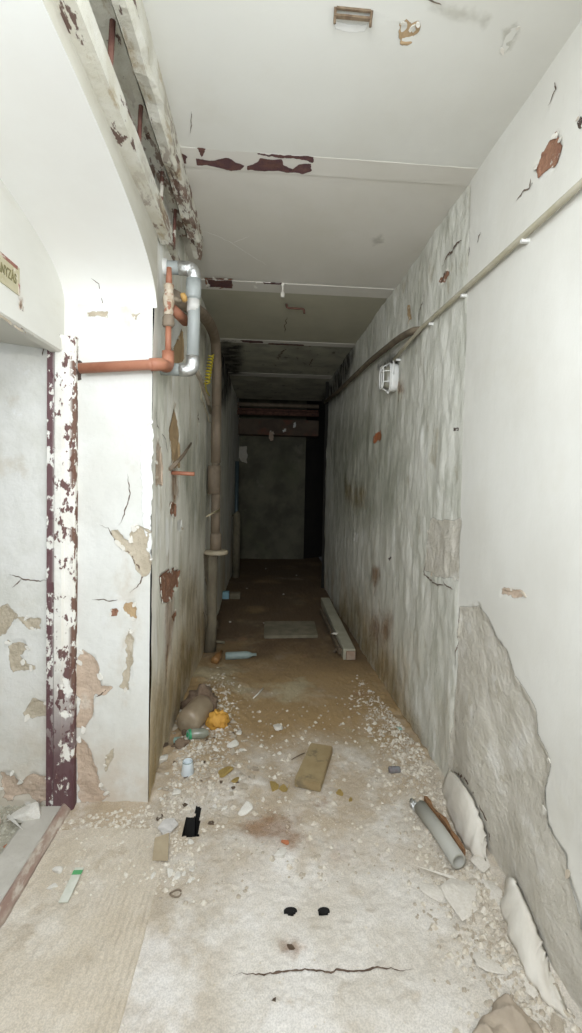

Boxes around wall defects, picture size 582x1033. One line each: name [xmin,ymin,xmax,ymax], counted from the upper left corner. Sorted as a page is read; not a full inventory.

spalling [398,19,421,46]
spalling [533,130,562,178]
spalling [0,604,41,672]
spalling [23,698,46,722]
spalling [76,602,137,803]
spalling [0,770,46,803]
spalling [448,605,582,1013]
crack [233,966,411,976]